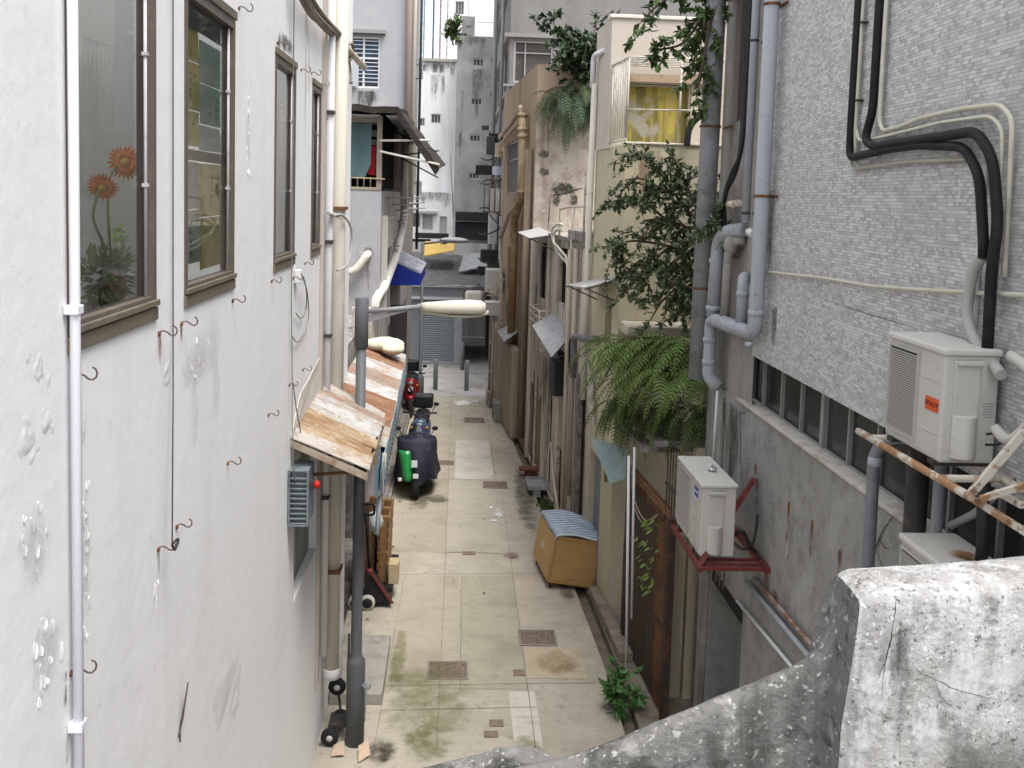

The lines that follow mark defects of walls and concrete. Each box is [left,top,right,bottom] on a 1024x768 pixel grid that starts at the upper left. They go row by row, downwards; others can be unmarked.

crack [851,516,911,719]
crack [912,663,1002,710]